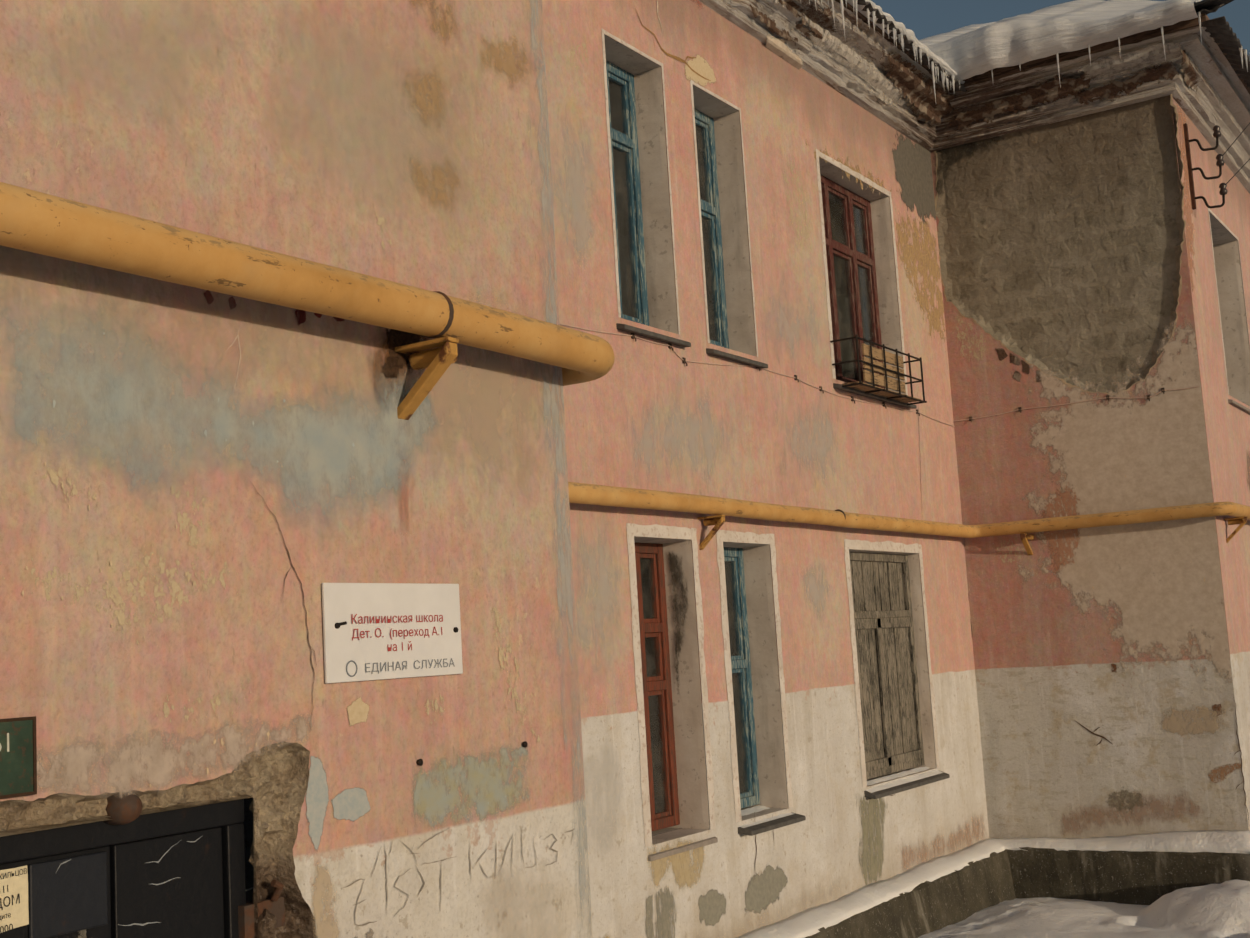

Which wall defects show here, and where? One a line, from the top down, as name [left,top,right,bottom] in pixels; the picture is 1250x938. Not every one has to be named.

crack [635,8,711,81]
peeling [685,54,717,87]
flaking render [750,0,1198,132]
peeling [806,143,891,194]
peeling [896,94,1232,683]
crack [253,485,317,722]
flaking render [0,715,371,938]
peeling [647,842,704,888]